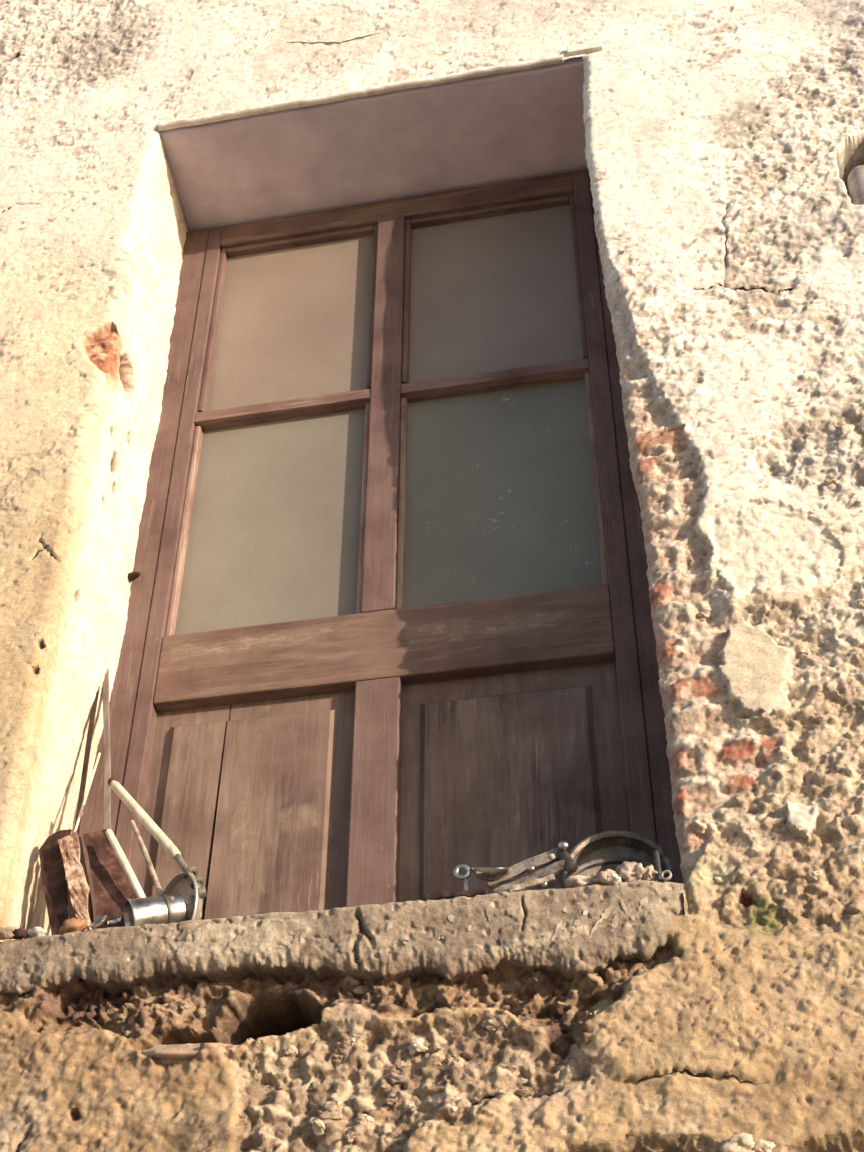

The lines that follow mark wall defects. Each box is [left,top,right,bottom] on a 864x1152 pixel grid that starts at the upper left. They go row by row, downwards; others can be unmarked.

crack [694,205,792,295]
spalling [81,322,136,396]
spalling [594,210,864,936]
crack [352,917,373,973]
spalling [0,918,683,1152]
crack [625,1069,761,1085]